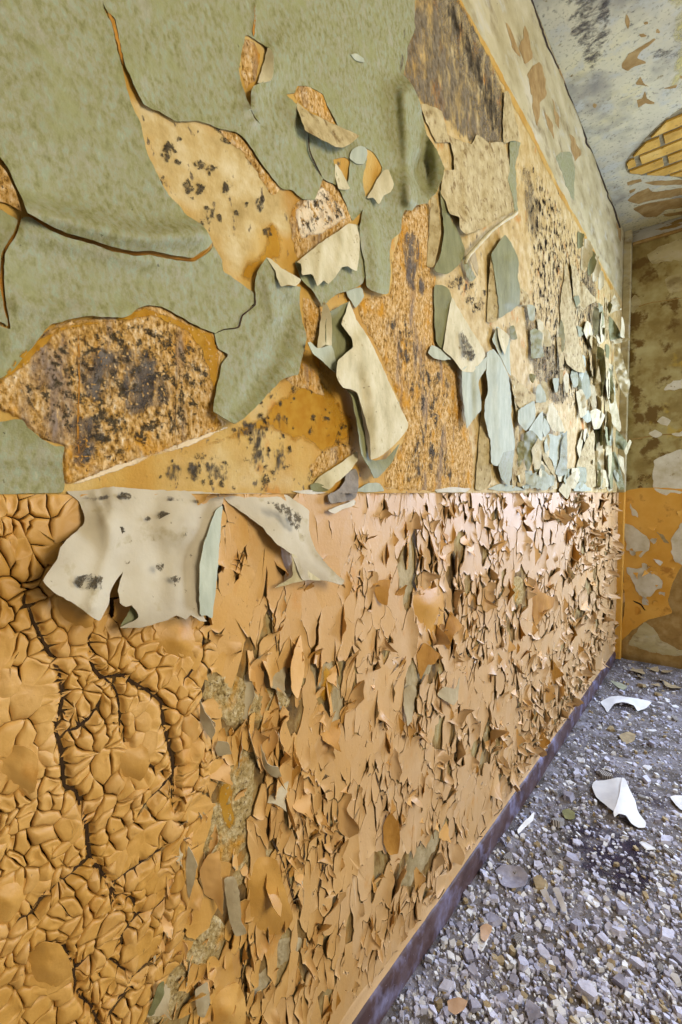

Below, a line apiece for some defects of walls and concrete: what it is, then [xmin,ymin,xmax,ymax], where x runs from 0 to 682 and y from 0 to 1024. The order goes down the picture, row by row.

crack [19,598,174,1024]
water stain [4,309,219,467]
peeling [43,452,474,1024]
peeling [0,0,521,499]
water stain [401,0,613,409]
peeling [358,204,682,851]
peeling [506,23,581,200]